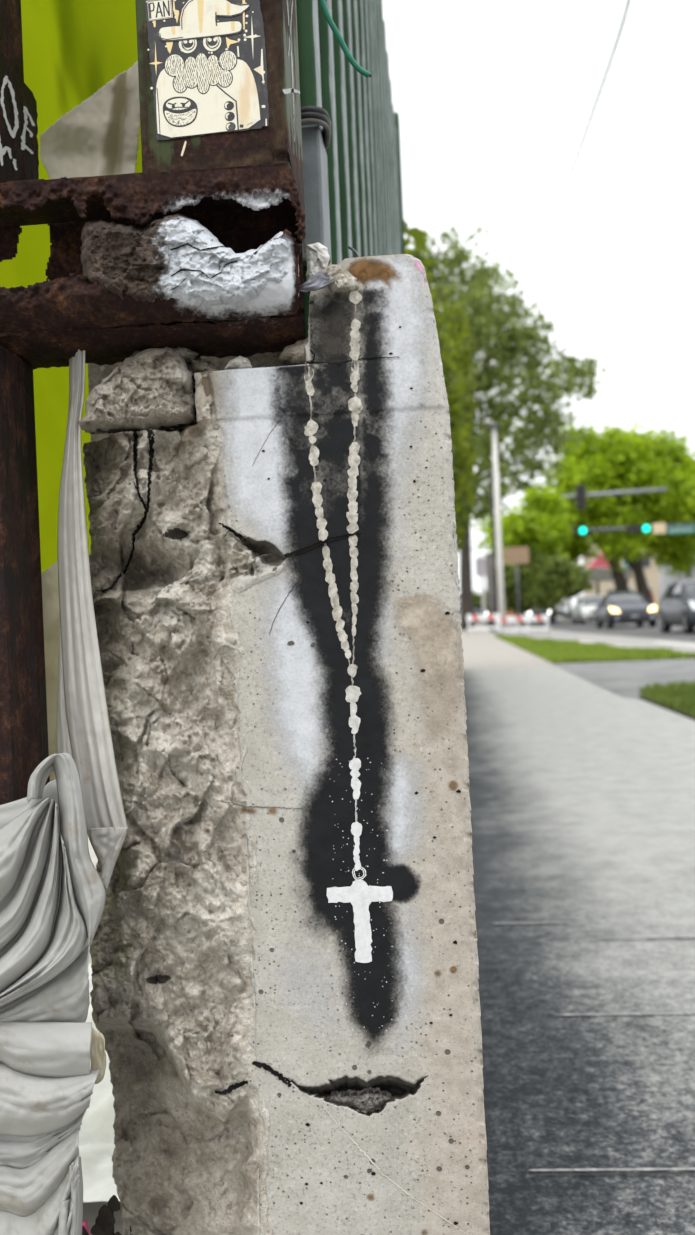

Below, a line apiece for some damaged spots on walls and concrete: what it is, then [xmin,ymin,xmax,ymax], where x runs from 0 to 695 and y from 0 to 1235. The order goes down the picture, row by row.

corrosion [140,32,149,139]
corrosion [147,0,287,172]
corrosion [347,259,396,285]
crack [95,375,197,592]
crack [219,523,250,546]
crack [269,533,360,635]
spalling [83,419,285,1235]
crack [215,1061,428,1116]